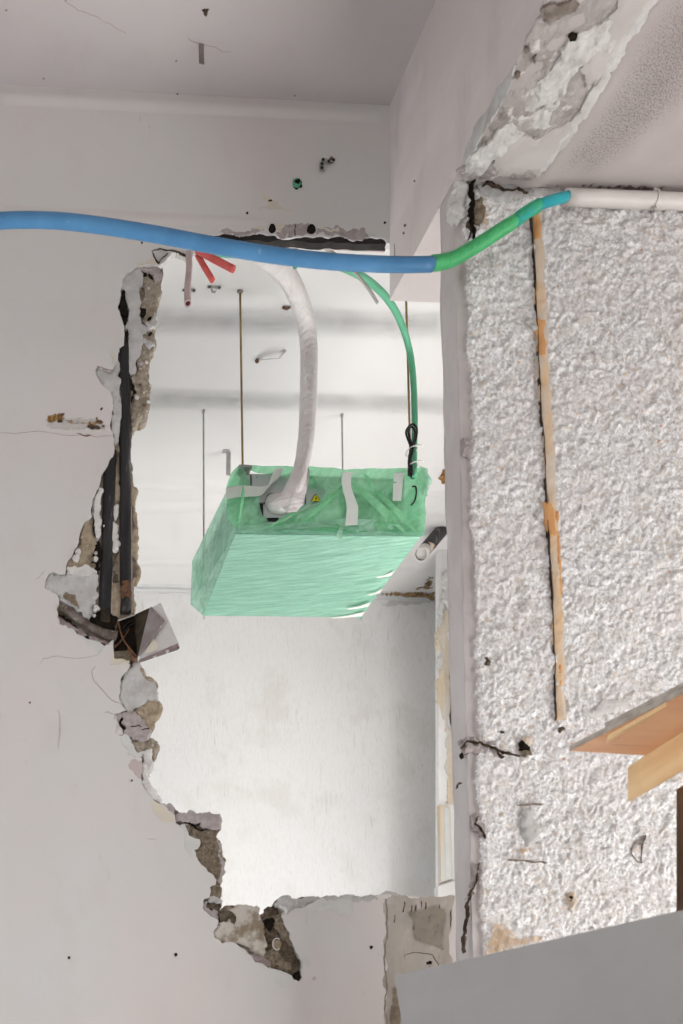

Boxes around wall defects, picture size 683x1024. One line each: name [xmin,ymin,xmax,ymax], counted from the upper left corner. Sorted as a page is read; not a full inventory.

spalling [446,0,659,227]
flaking render [221,193,377,242]
crack [466,179,529,242]
flaking render [96,267,163,447]
corrosion [47,407,105,437]
spalling [91,542,103,576]
corrosion [382,577,435,601]
spalling [89,612,118,631]
crack [456,740,523,789]
flaking render [110,657,480,1024]
crack [461,817,486,953]